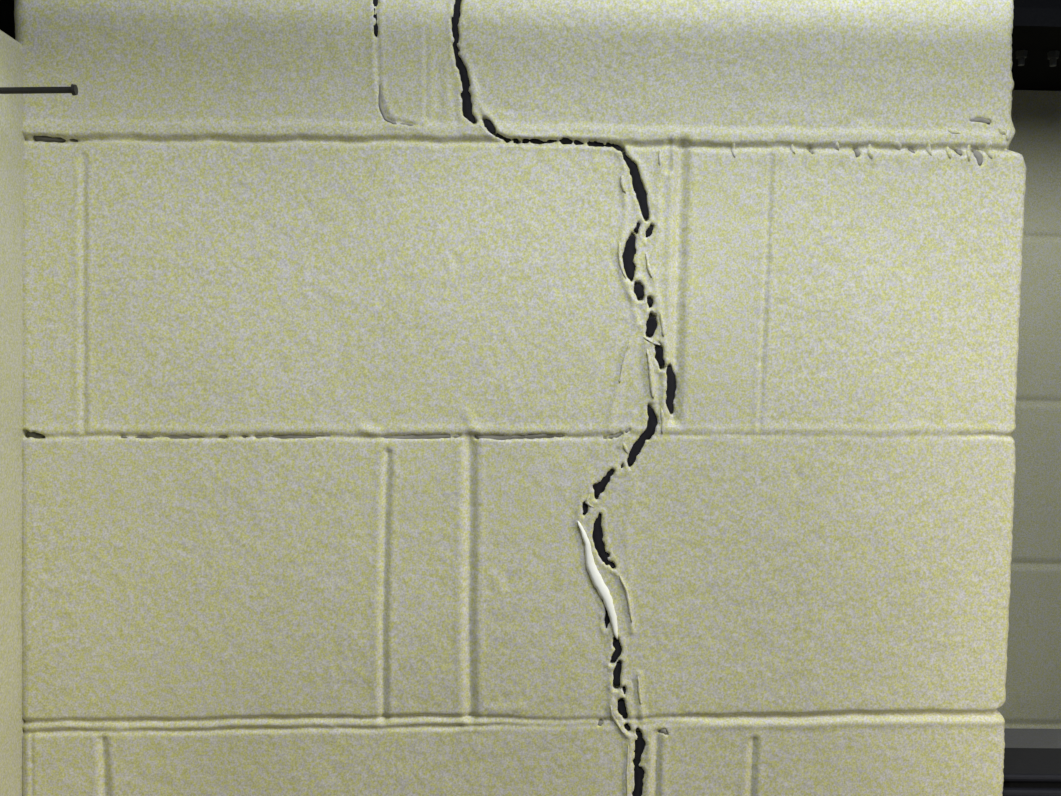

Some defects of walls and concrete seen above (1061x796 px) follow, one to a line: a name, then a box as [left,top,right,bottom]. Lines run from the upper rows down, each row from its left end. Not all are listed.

crack [371,0,379,37]
crack [378,84,413,126]
crack [451,0,676,796]
crack [121,433,325,441]
crack [382,433,563,441]